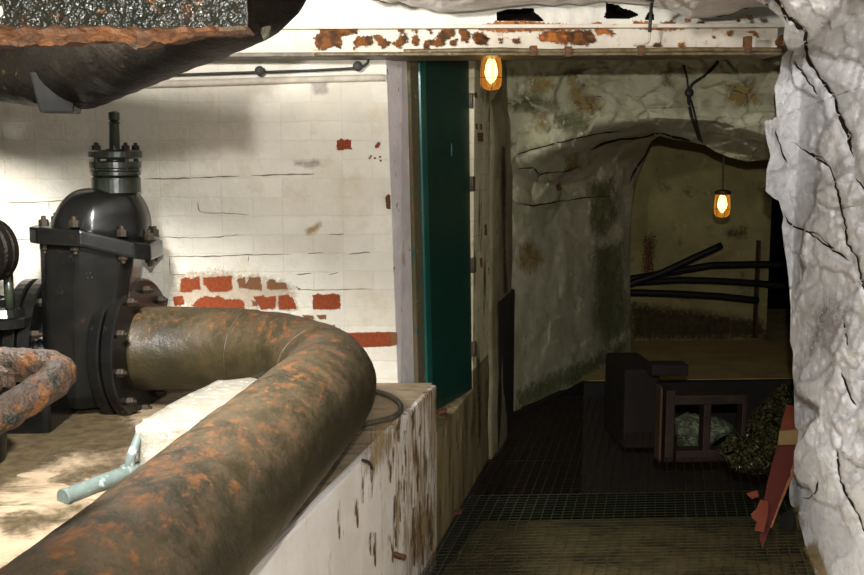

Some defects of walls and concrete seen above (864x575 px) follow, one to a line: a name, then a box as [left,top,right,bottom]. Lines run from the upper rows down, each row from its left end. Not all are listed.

corrosion [313,20,616,51]
spalling [497,8,543,21]
peeling [336,138,352,151]
crack [517,131,690,207]
crack [775,0,864,289]
water stain [590,180,617,236]
peeling [173,275,398,347]
water stain [517,243,767,408]